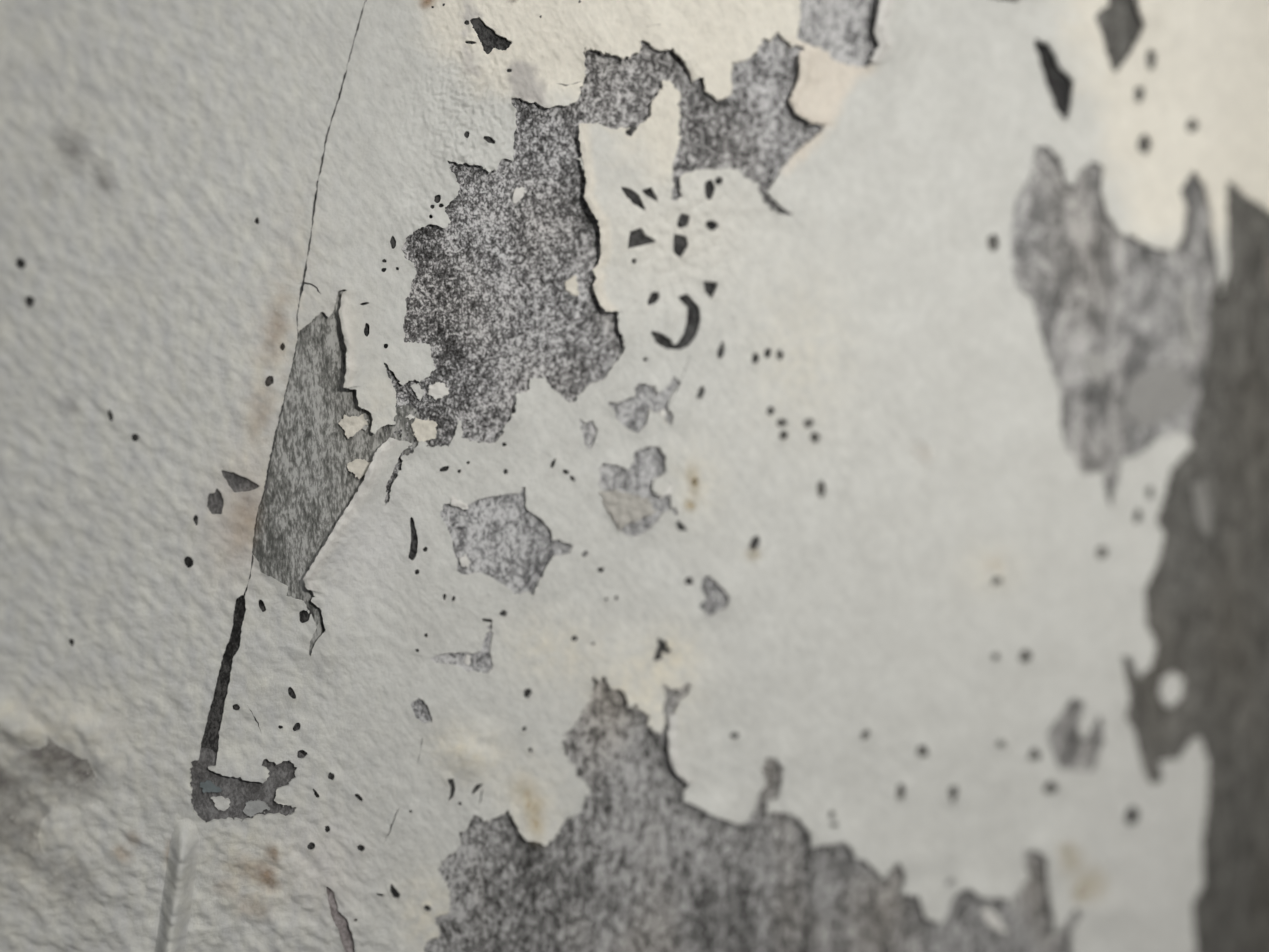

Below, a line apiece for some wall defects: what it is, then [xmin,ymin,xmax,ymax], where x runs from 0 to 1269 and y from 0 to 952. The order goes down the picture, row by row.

spalling [1134,86,1143,103]
spalling [1137,134,1150,154]
spalling [1146,50,1155,71]
spalling [1186,118,1198,132]
peeling [252,0,908,656]
peeling [987,146,1269,952]
peeling [190,748,308,822]
peeling [424,676,1083,952]